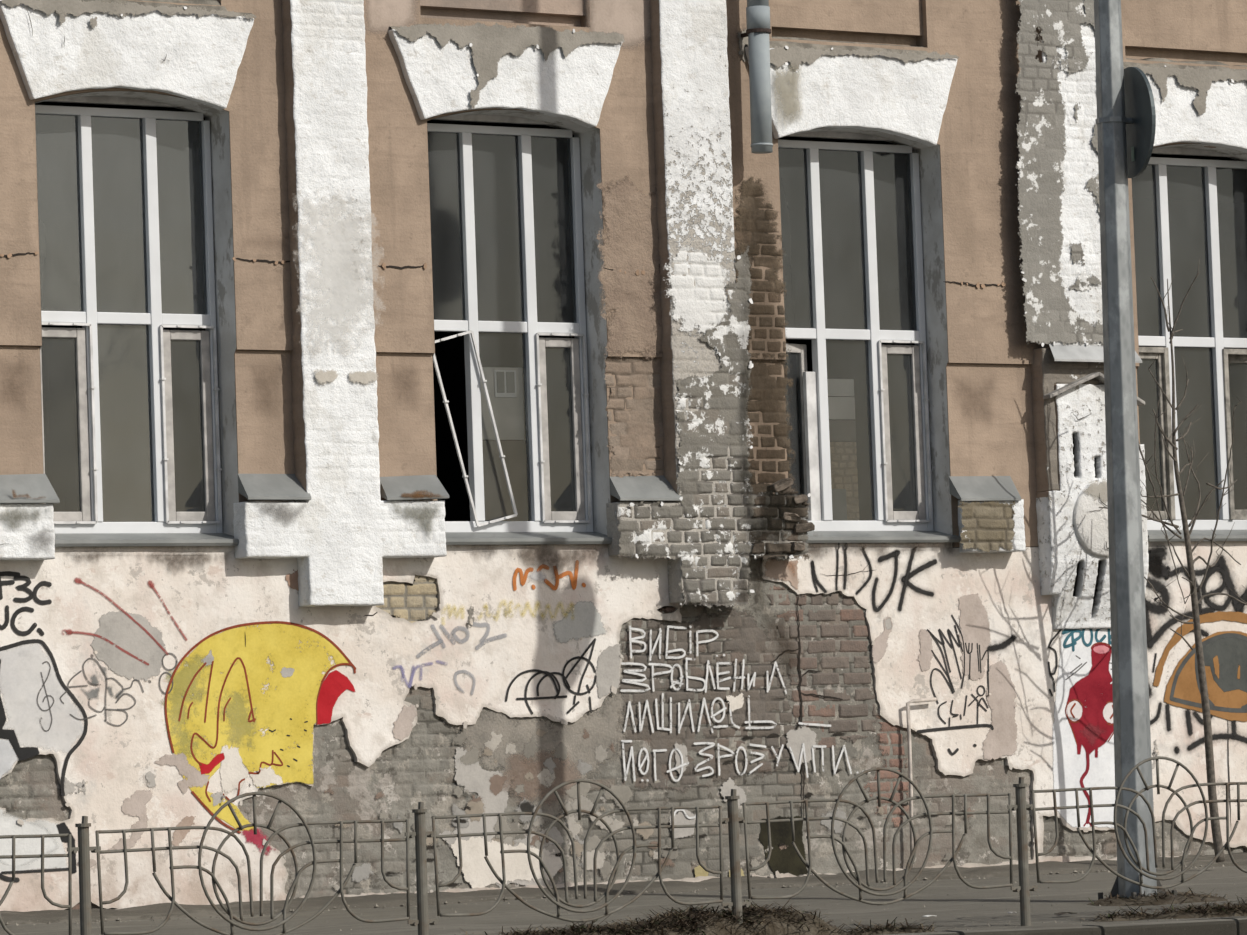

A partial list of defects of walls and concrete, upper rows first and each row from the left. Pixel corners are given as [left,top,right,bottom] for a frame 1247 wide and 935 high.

peeling [393,22,625,108]
peeling [1123,65,1247,115]
peeling [1015,0,1103,347]
flaking render [108,173,1117,898]
peeling [90,611,166,682]
spalling [0,754,88,825]